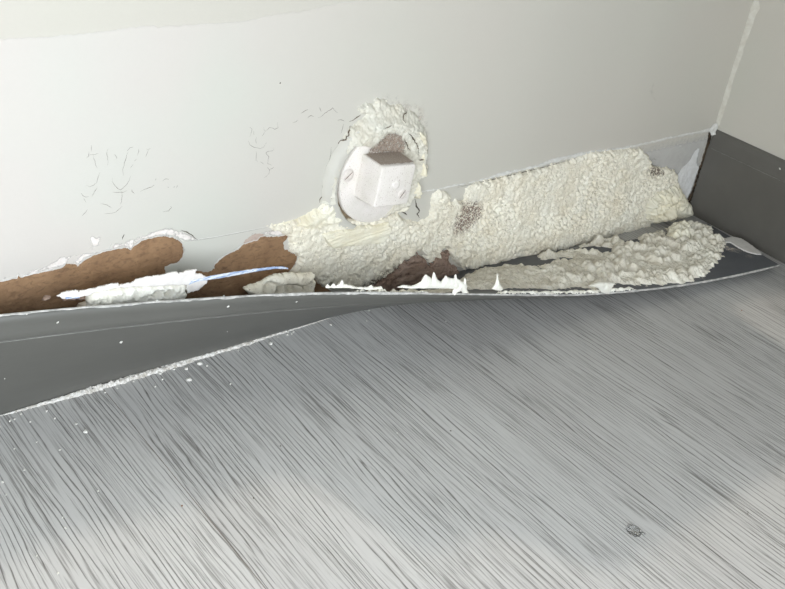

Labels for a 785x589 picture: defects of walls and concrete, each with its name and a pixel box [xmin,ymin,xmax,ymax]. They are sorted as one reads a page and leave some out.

crack [250,107,360,178]
crack [81,146,178,216]